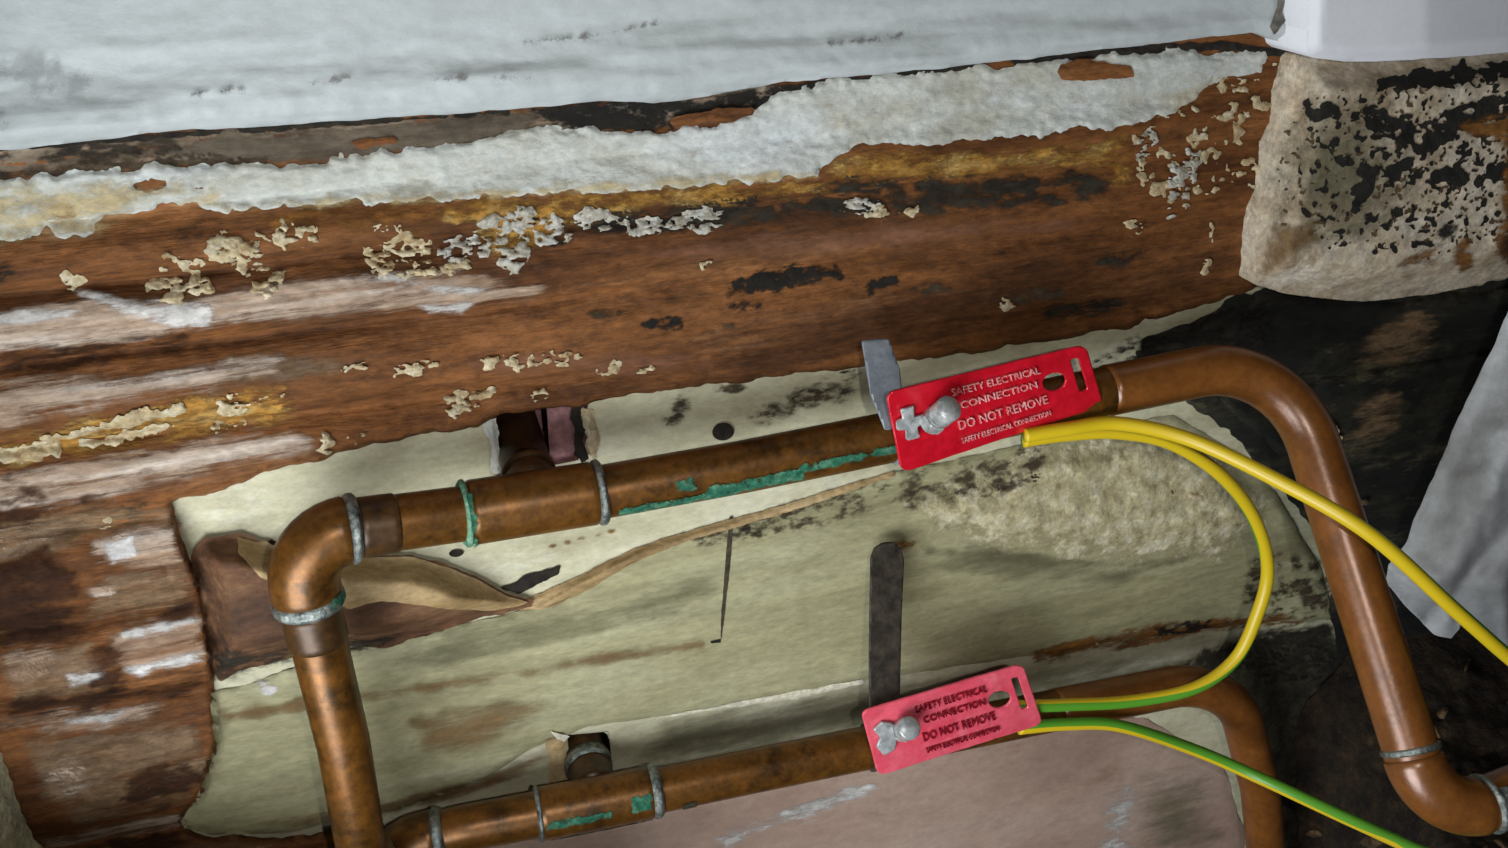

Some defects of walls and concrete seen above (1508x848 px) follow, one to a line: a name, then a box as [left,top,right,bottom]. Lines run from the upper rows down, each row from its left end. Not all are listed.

flaking render [1170,33,1274,48]
flaking render [385,114,453,128]
flaking render [509,107,547,116]
flaking render [132,128,227,141]
water stain [0,85,782,240]
mould [1277,58,1508,260]
rust [267,134,1129,257]
water stain [291,170,1109,247]
rust [469,353,683,374]
flaking render [115,581,155,594]
rust [1033,614,1303,662]
flaking render [82,737,142,762]